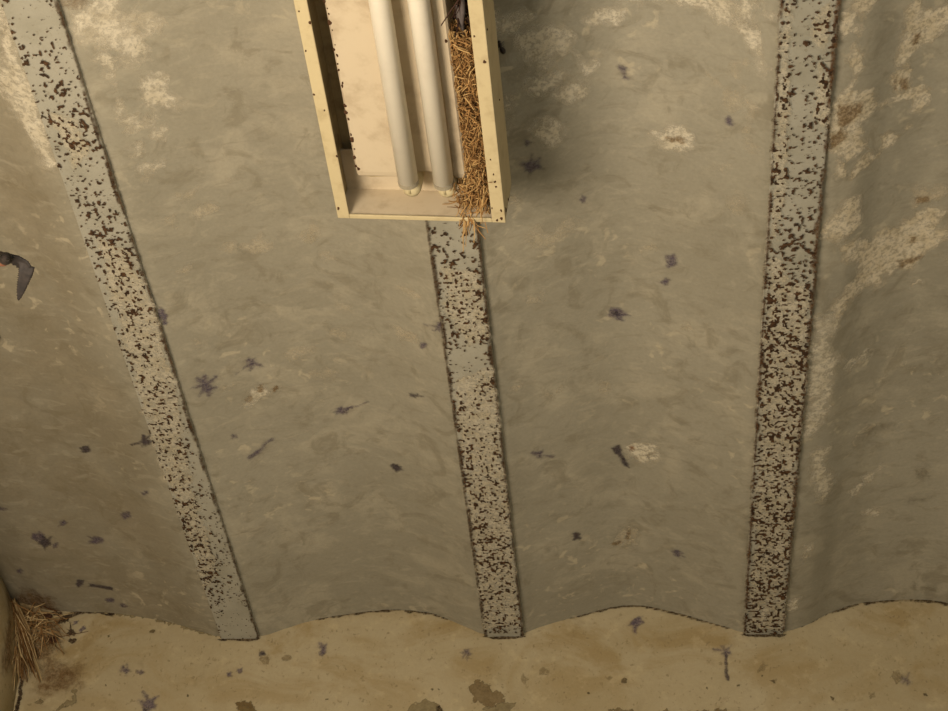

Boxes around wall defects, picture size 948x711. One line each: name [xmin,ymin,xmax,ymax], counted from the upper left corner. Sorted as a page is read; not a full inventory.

flaking render [408,699,442,711]
flaking render [469,679,515,711]